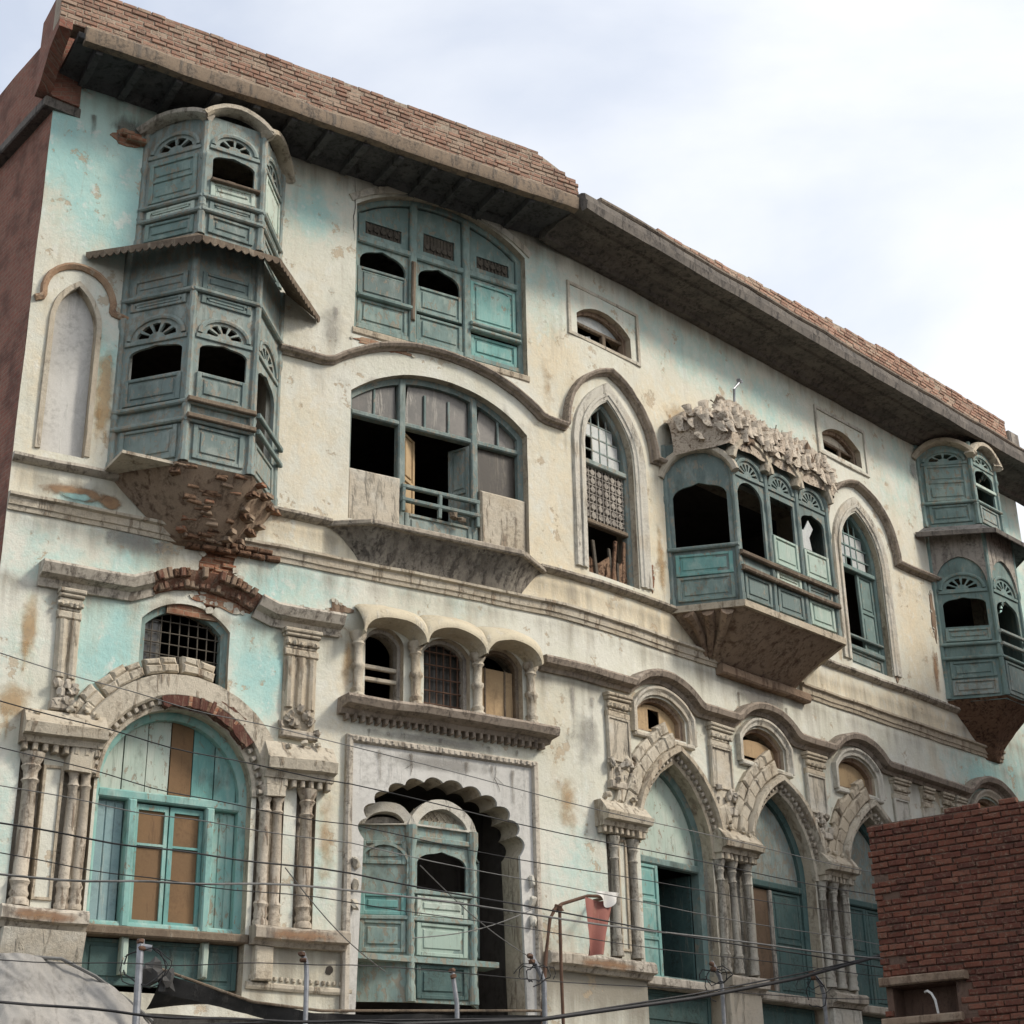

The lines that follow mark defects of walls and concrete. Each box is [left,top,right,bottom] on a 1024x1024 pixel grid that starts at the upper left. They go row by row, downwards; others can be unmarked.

peeling [49,484,121,510]
spalling [153,461,282,622]
spalling [161,695,253,749]